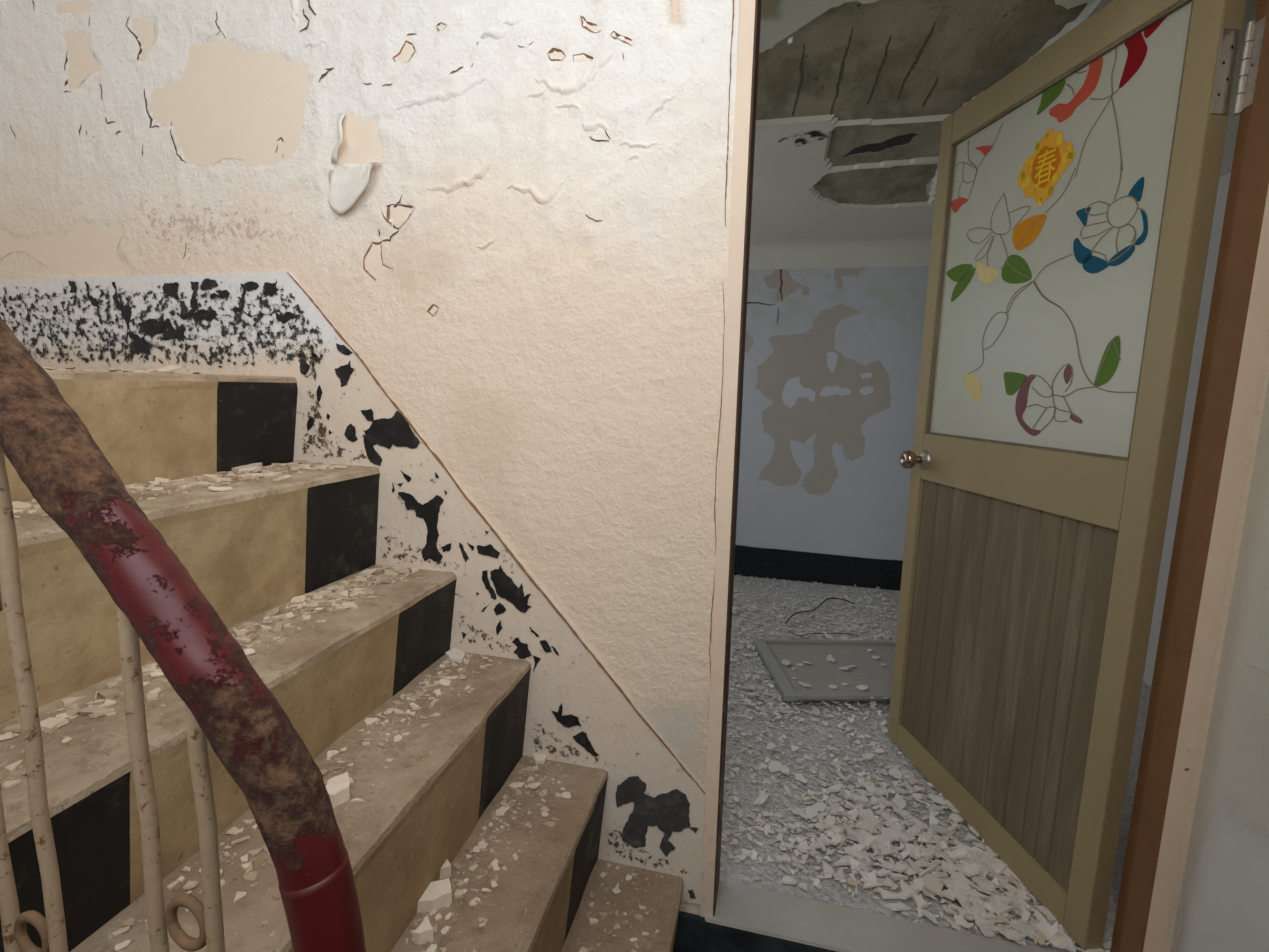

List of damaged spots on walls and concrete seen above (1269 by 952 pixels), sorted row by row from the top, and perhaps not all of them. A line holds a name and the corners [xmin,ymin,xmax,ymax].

peeling [392,41,415,63]
peeling [149,39,311,168]
spalling [756,0,1087,205]
peeling [328,113,383,213]
crack [374,195,402,243]
peeling [386,204,415,228]
peeling [0,278,420,466]
peeling [756,268,891,496]
flaking render [231,463,262,473]
peeling [381,471,559,672]
peeling [530,703,615,767]
peeling [607,776,699,874]